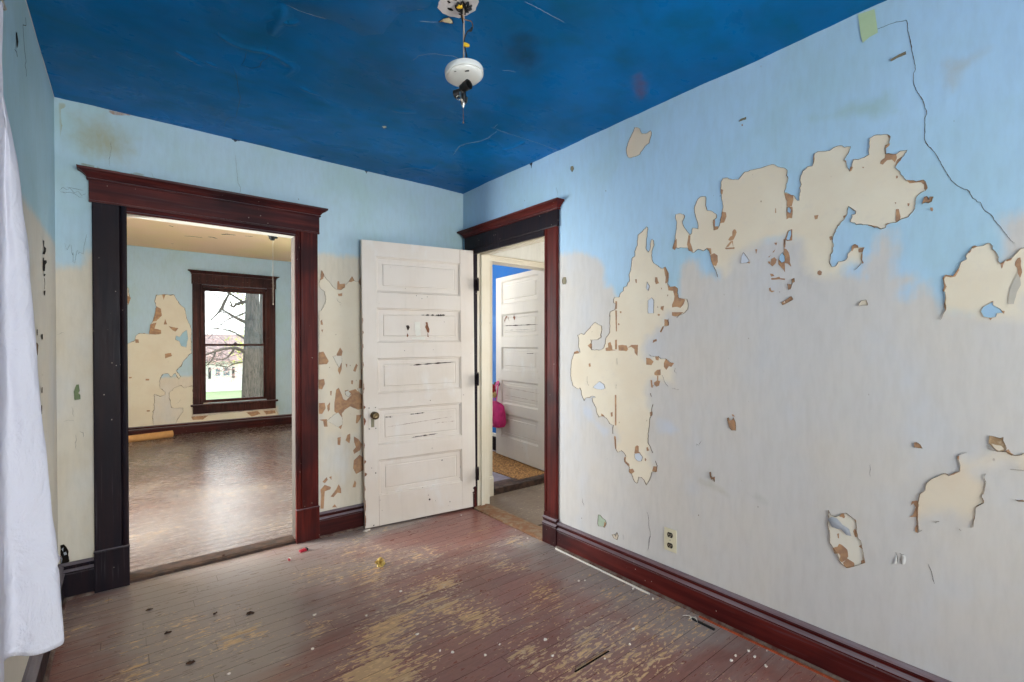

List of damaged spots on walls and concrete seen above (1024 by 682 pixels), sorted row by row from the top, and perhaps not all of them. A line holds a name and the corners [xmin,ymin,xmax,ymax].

peeling [626,127,652,158]
crack [878,20,1013,242]
peeling [673,134,933,305]
peeling [940,243,1024,335]
peeling [128,294,278,427]
peeling [318,271,376,509]
peeling [570,227,689,485]
peeling [828,510,865,568]
peeling [910,436,1024,533]